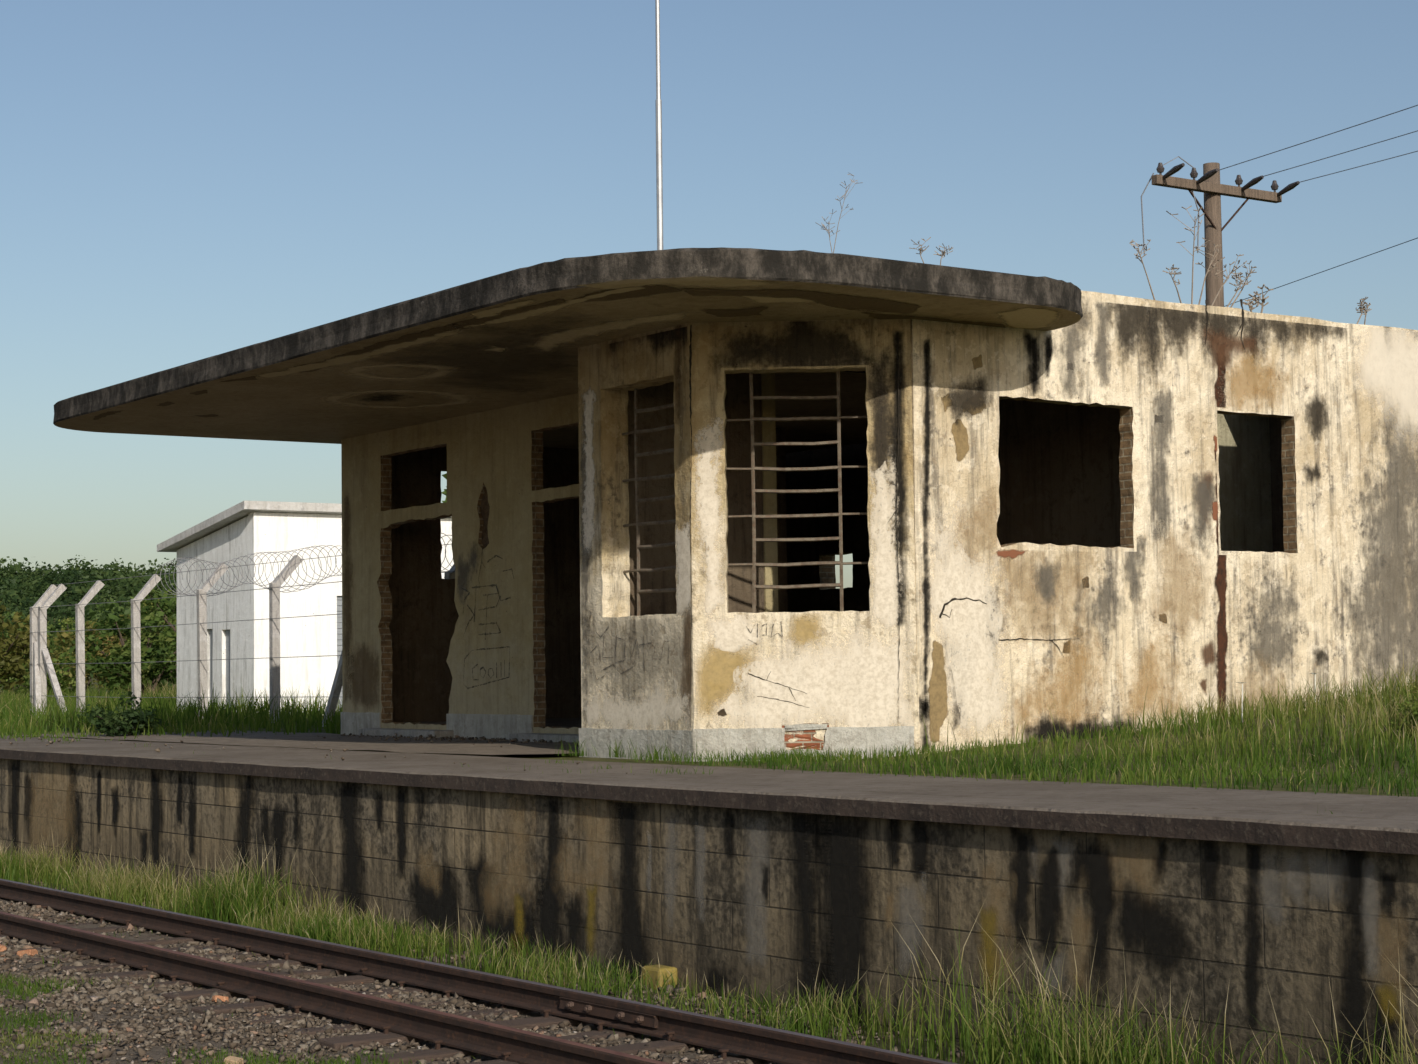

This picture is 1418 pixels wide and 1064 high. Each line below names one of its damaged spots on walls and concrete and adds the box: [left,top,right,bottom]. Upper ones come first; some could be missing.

spalling [481,487,490,548]
peeling [582,389,596,551]
peeling [584,679,691,730]
water stain [719,321,906,626]
peeling [676,417,1025,751]
crack [888,339,900,718]
water stain [919,340,931,748]
crack [939,597,987,618]
crack [999,638,1079,657]
water stain [1024,301,1344,408]
corrosion [1198,451,1228,717]
water stain [1343,412,1418,691]